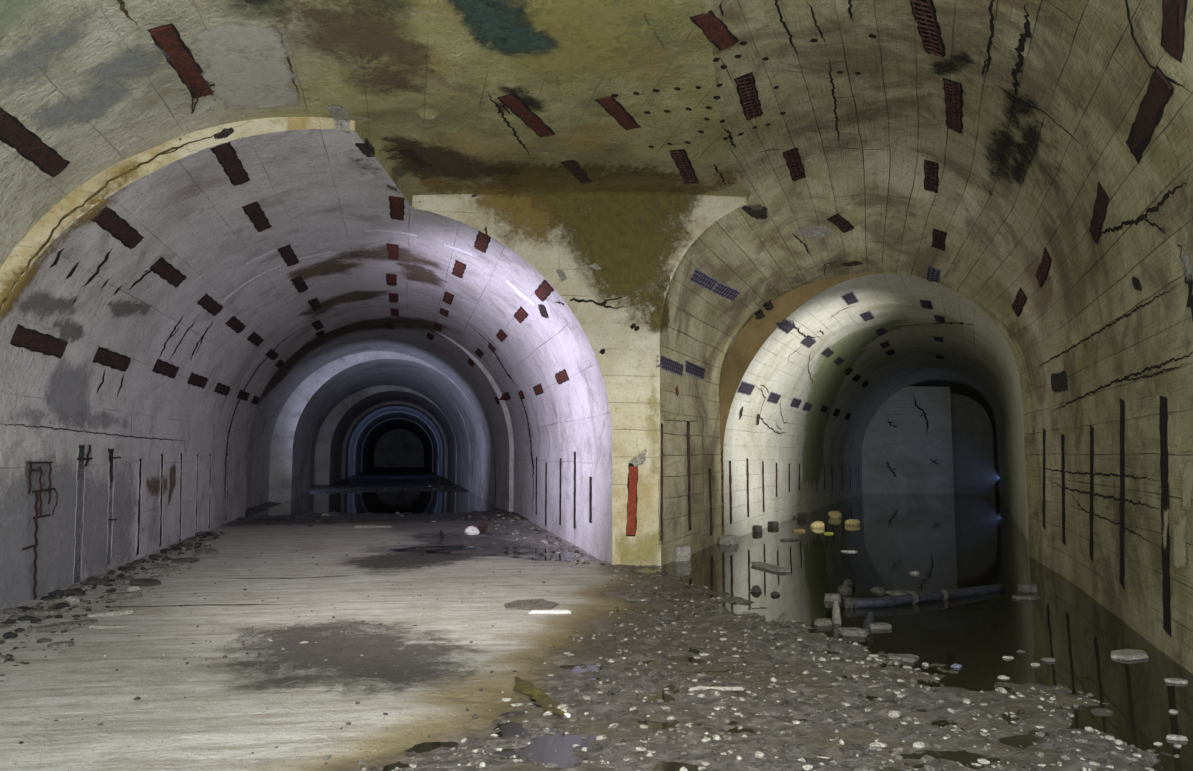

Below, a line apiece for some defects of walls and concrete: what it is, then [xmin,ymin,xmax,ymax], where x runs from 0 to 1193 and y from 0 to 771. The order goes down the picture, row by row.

crack [117,0,138,26]
water stain [236,0,434,93]
water stain [448,0,664,81]
water stain [932,52,973,76]
water stain [984,89,1042,196]
crack [0,121,254,311]
water stain [356,137,741,332]
crack [1032,177,1193,371]
crack [158,315,214,360]
crack [4,369,186,441]
crack [758,385,808,448]
crack [1054,351,1193,411]